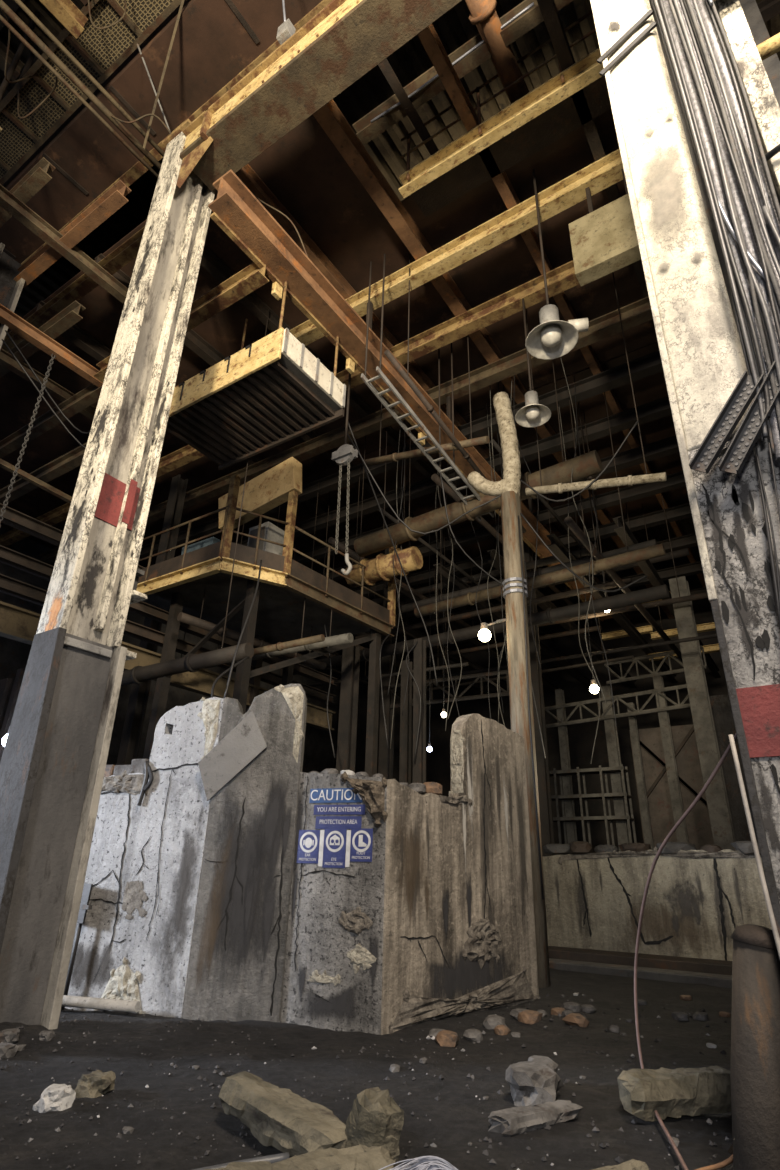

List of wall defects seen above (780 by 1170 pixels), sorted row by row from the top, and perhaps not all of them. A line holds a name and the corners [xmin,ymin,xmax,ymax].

spalling [94,957,146,1014]
crack [90,763,198,981]
damp [244,782,291,957]
spalling [307,970,341,986]
spalling [339,906,378,974]
damp [400,819,429,918]
crack [576,859,592,937]
crack [607,858,673,945]